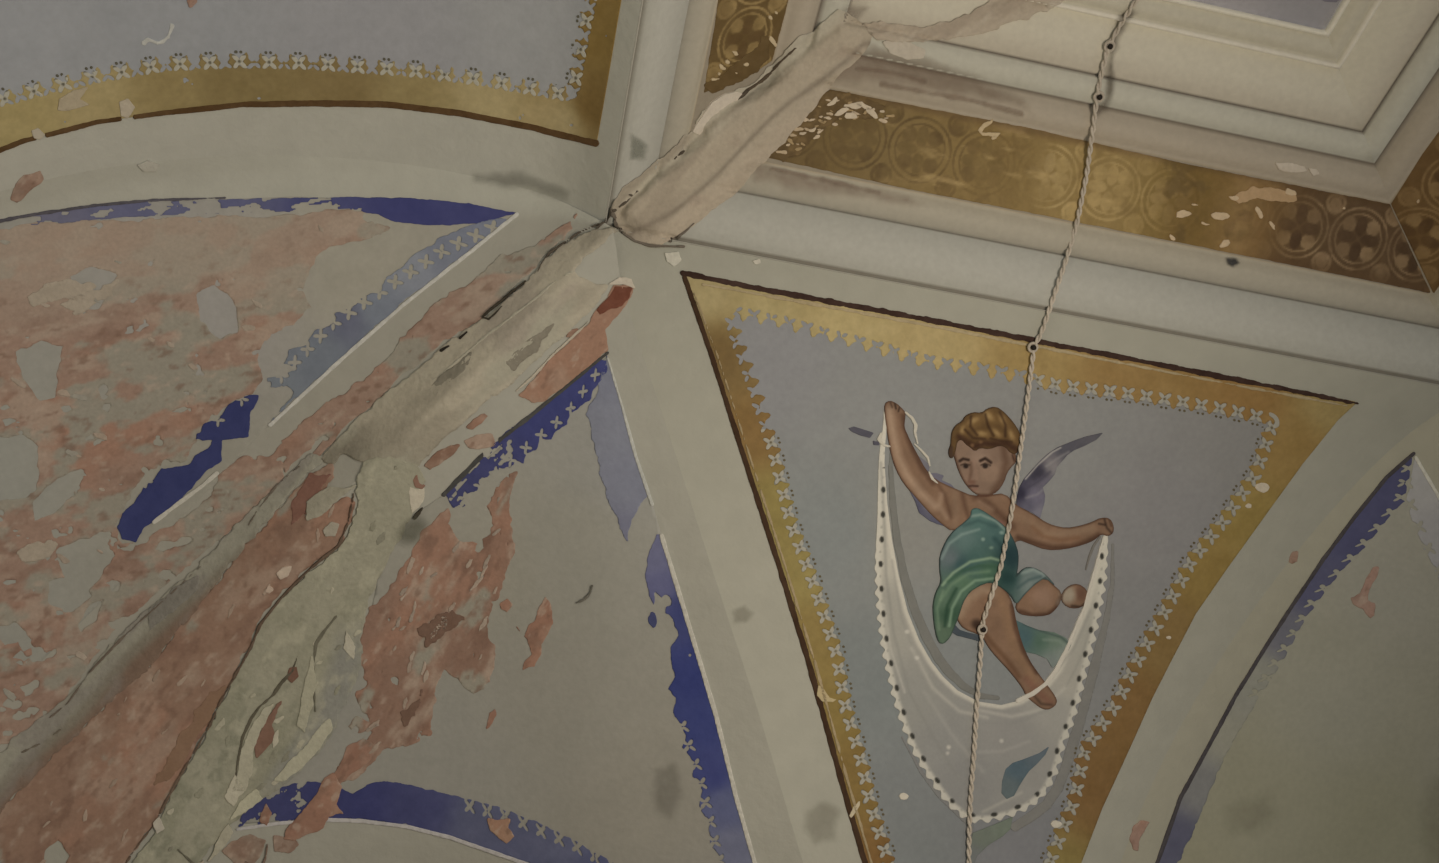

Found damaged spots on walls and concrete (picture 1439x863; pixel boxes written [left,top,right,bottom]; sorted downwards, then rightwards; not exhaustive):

crack [439,191,694,352]
spalling [692,11,797,135]
peeling [775,97,895,154]
peeling [1176,196,1239,225]
peeling [1275,162,1319,196]
peeling [516,277,635,403]
peeling [0,209,577,863]